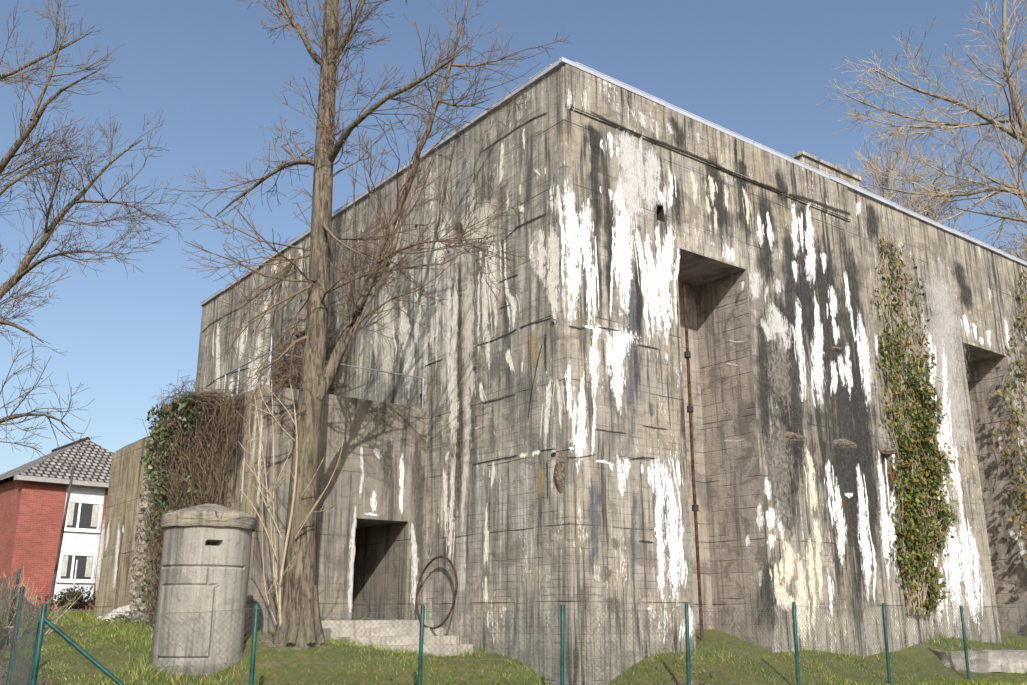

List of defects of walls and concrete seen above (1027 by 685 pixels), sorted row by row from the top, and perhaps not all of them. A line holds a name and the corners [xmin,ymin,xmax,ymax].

damp [565,87,589,112]
damp [212,248,305,503]
damp [519,110,700,641]
damp [690,159,900,645]
spalling [833,438,857,448]